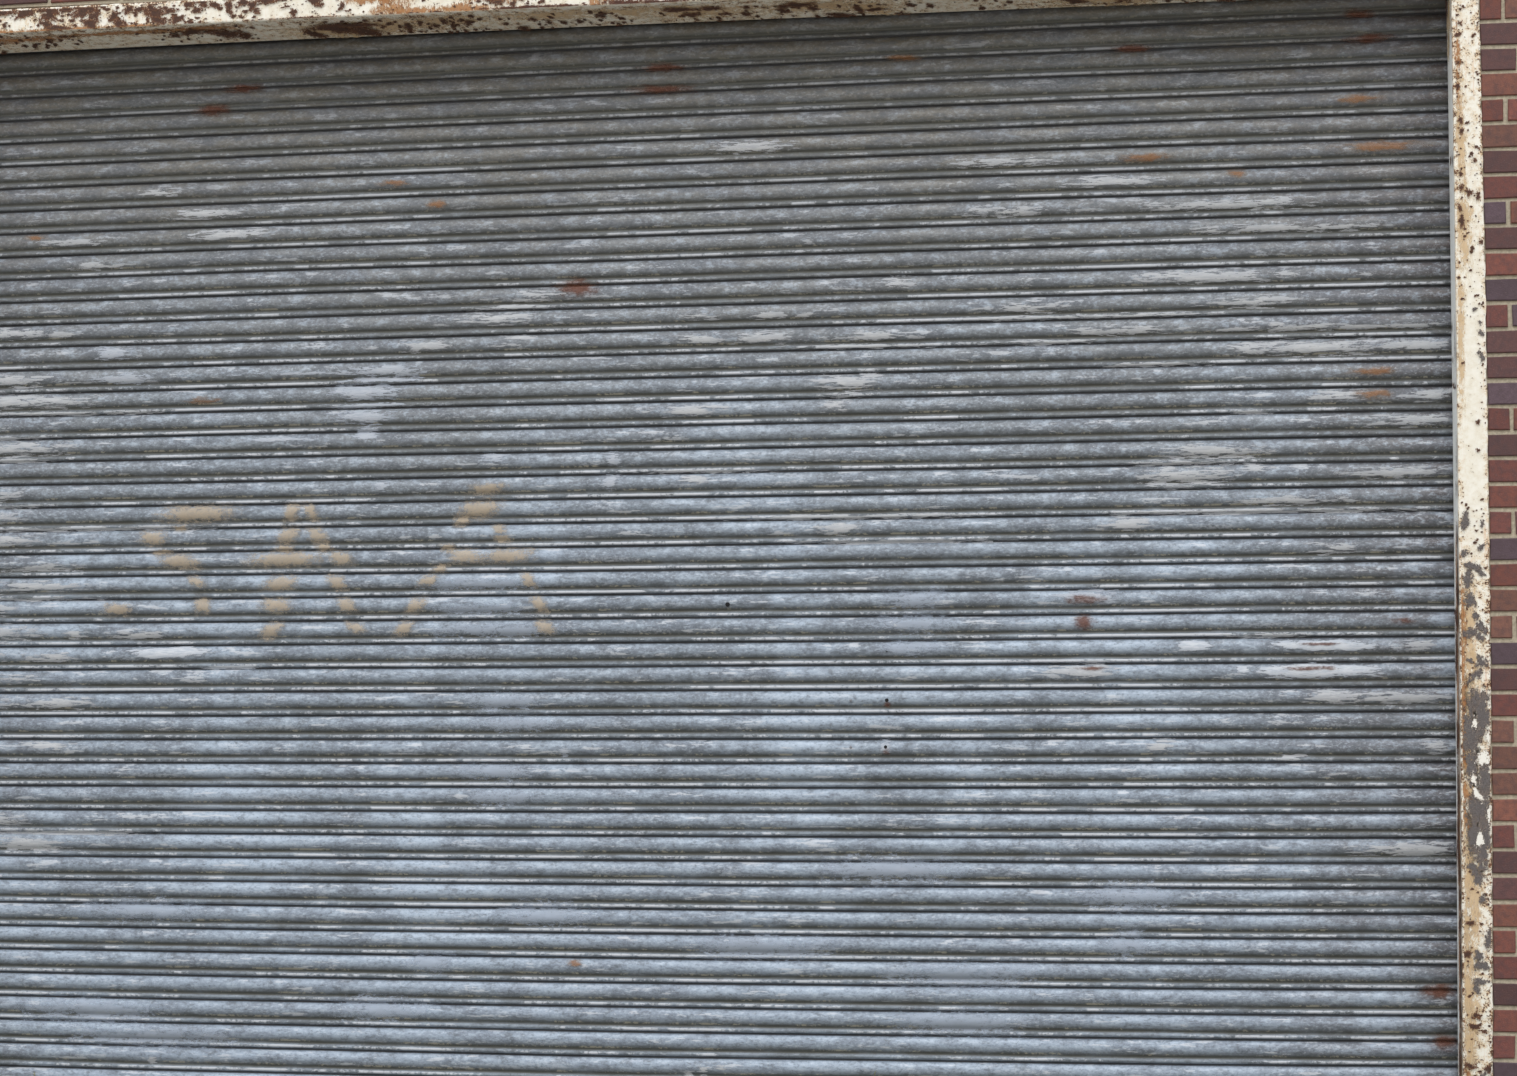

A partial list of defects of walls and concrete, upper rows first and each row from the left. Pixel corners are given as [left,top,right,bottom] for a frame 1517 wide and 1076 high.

peeling [0,0,633,55]
rust [0,0,902,45]
rust [1354,142,1408,151]
peeling [138,188,278,241]
peeling [950,2,1486,428]
rust [1445,0,1474,401]
rust [559,277,597,296]
peeling [662,311,933,350]
peeling [0,346,163,464]
peeling [226,339,452,443]
rust [1068,595,1106,630]
peeling [1096,443,1491,1076]